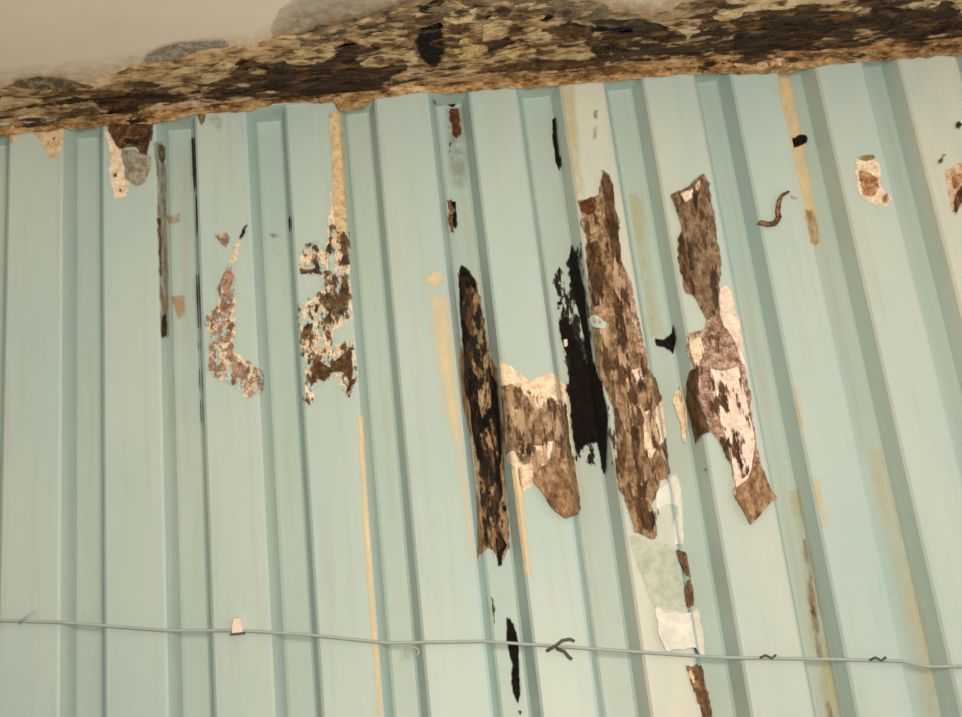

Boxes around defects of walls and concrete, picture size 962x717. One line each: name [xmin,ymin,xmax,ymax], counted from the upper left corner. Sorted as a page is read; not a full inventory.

spalling [0,0,962,215]
peeling [202,225,264,397]
peeling [297,111,358,405]
peeling [499,361,581,518]
peeling [578,170,777,655]